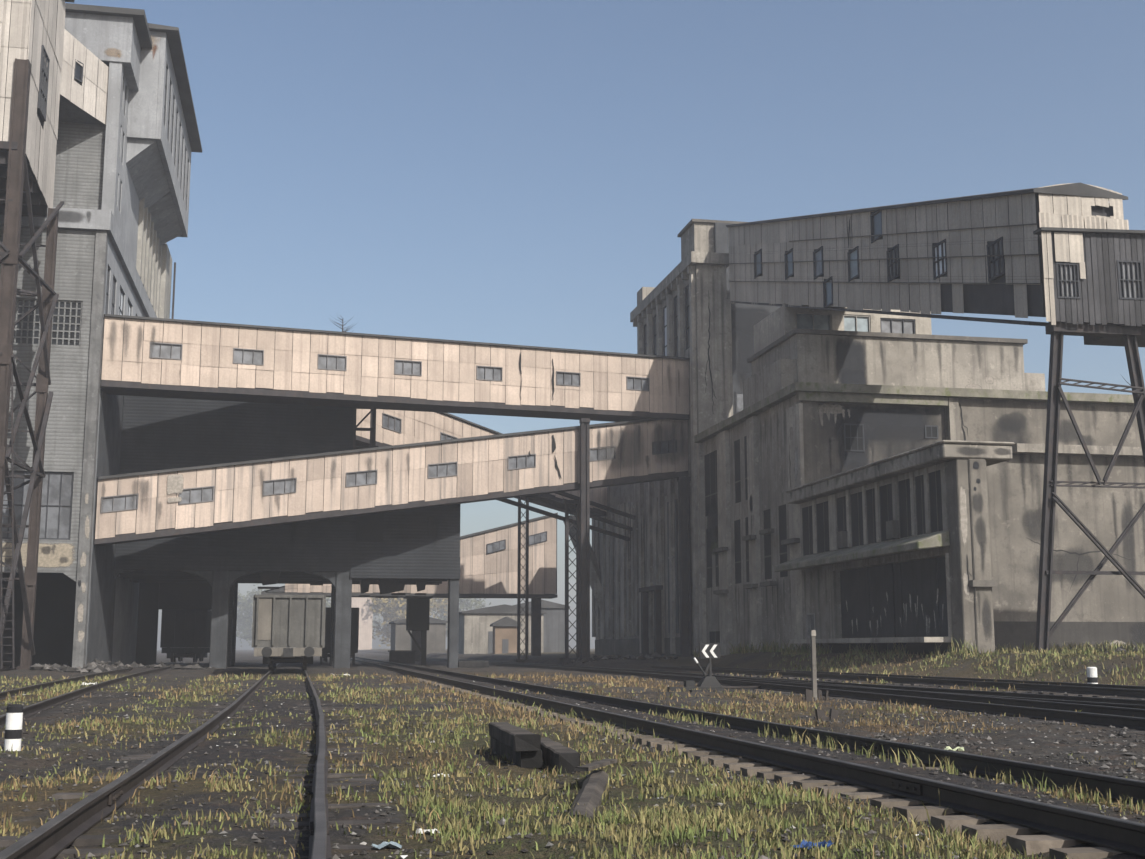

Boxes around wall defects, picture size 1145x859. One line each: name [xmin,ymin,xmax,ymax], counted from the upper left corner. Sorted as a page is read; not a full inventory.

crack [529,435,561,478]
water stain [973,496,985,562]